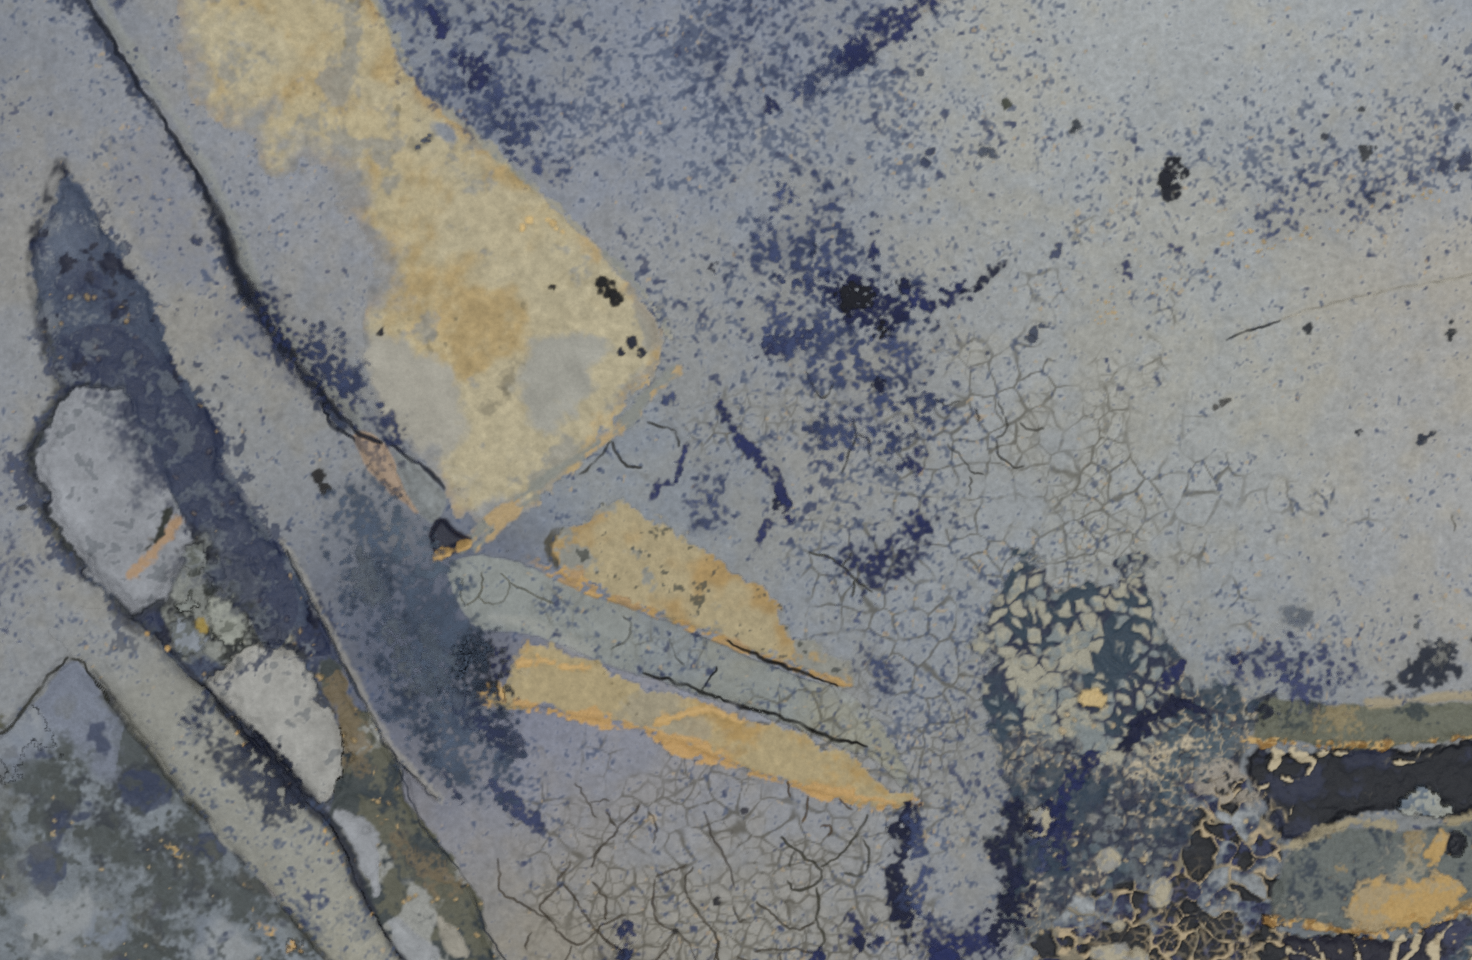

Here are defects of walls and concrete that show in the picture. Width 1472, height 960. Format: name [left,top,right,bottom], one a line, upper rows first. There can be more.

crack [582,442,641,473]
crack [847,419,870,460]
crack [936,400,1043,487]
flaking render [0,163,504,960]
crack [467,574,551,605]
crack [810,552,872,596]
crack [321,621,361,698]
crack [644,640,867,747]
crack [393,753,453,863]
crack [483,782,870,960]